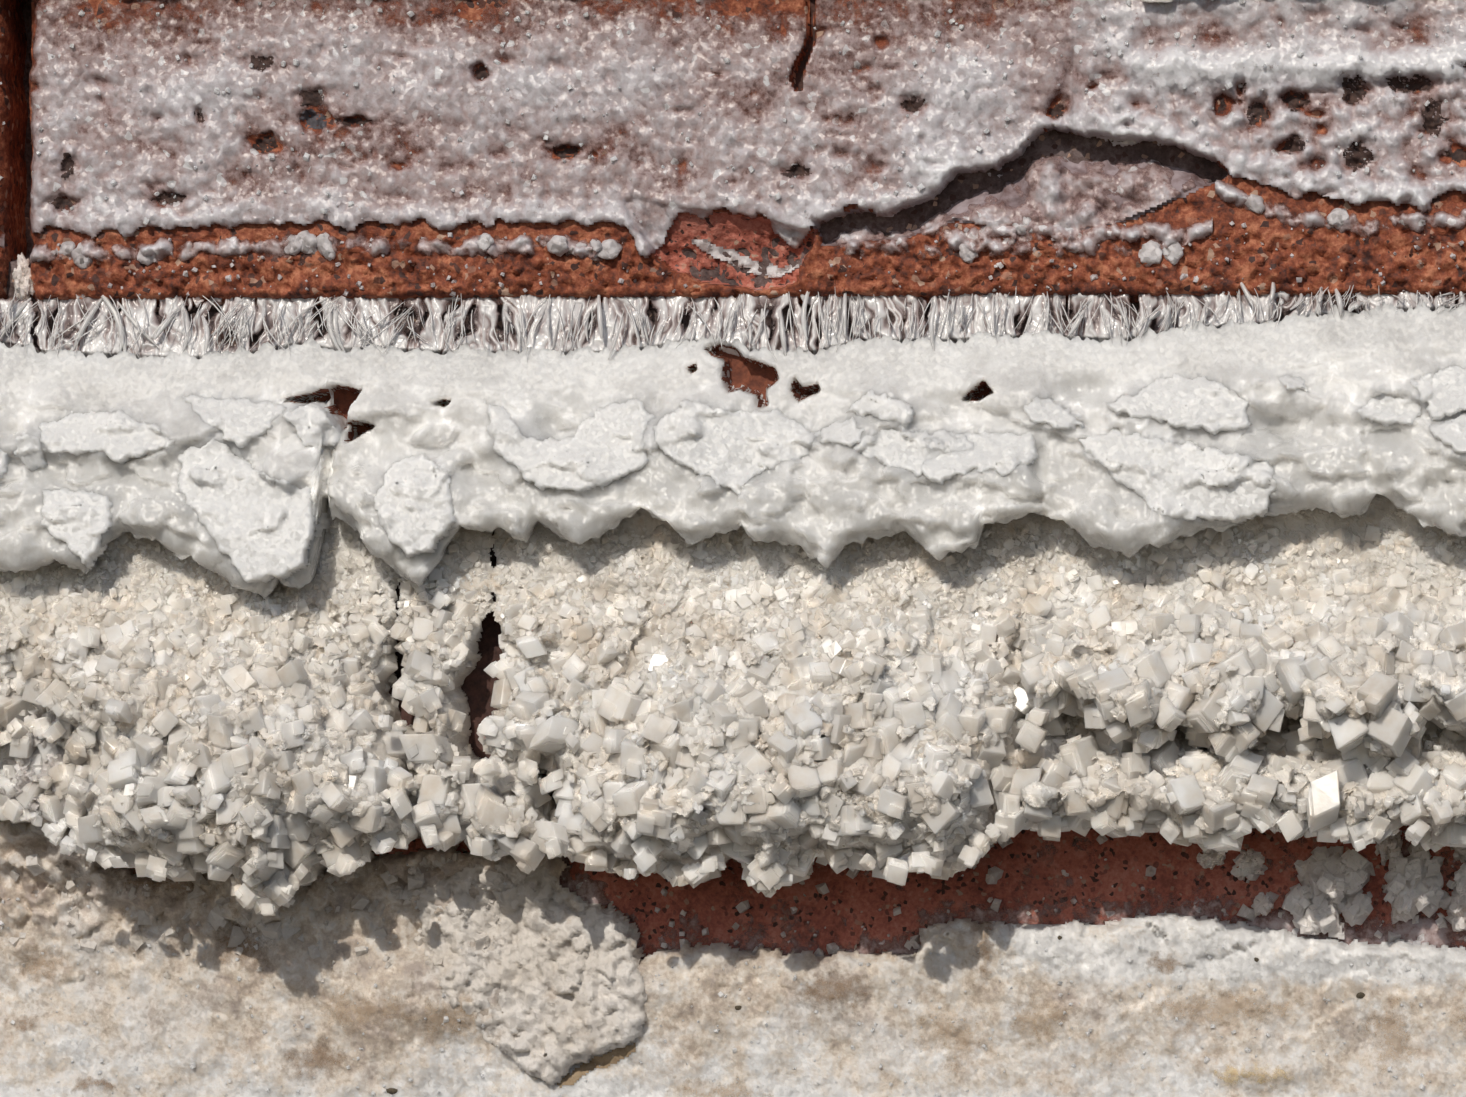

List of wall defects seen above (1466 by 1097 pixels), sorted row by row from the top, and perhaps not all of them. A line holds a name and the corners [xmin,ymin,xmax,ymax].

crack [793,0,816,91]
damp [29,0,1466,278]
spalling [781,164,812,178]
spalling [1045,103,1065,133]
spalling [941,157,1228,230]
spalling [1281,135,1305,154]
spalling [1342,75,1366,104]
spalling [1343,141,1374,172]
spalling [1386,74,1466,163]
spalling [654,212,839,291]
damp [0,289,1466,1097]